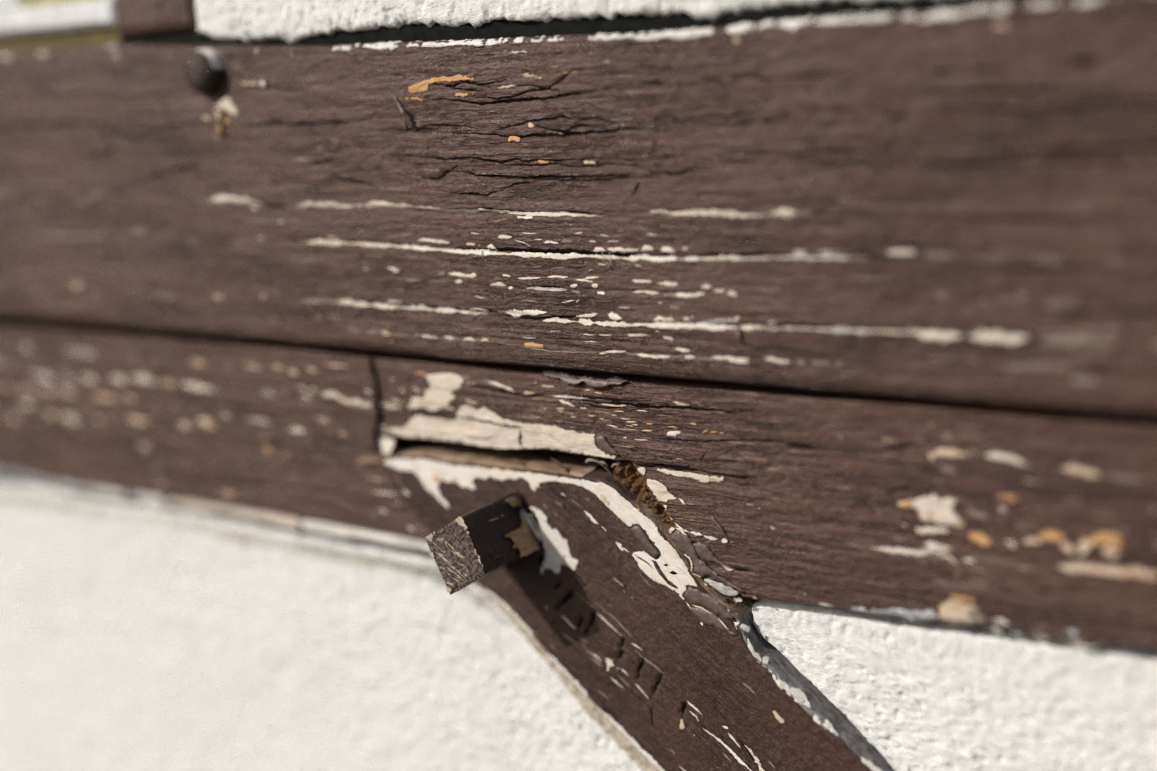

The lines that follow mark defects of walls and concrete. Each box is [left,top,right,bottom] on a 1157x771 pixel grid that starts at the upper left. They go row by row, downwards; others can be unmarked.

peeling [332,35,564,54]
peeling [588,0,1100,54]
crack [262,66,789,215]
crack [372,356,523,446]
crack [466,385,825,479]
crack [881,443,922,451]
peeling [0,467,431,552]
peeling [223,355,839,736]
crack [553,580,596,634]
peeling [845,494,1157,648]
crack [616,637,662,726]
peeling [598,707,664,771]